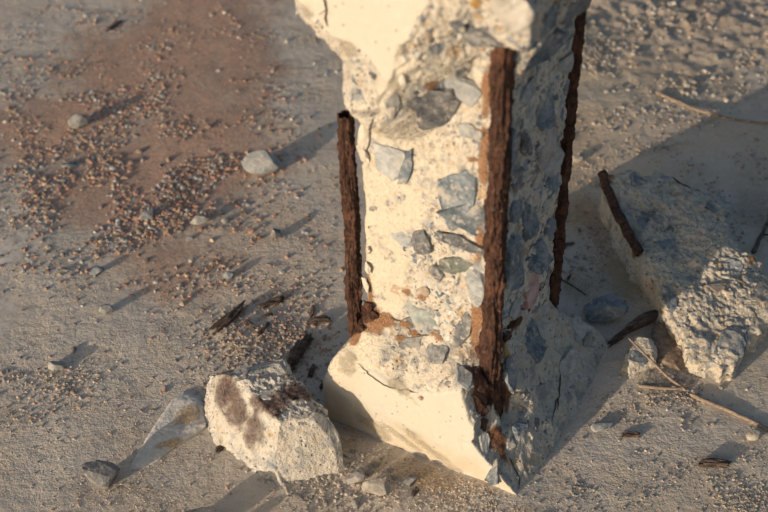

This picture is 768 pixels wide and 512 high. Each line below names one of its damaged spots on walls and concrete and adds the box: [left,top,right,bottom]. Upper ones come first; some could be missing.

corrosion [467,71,490,188]
spalling [295,0,610,492]
corrosion [349,274,419,346]
corrosion [465,304,507,462]
corrosion [501,379,512,414]
crack [552,373,561,420]